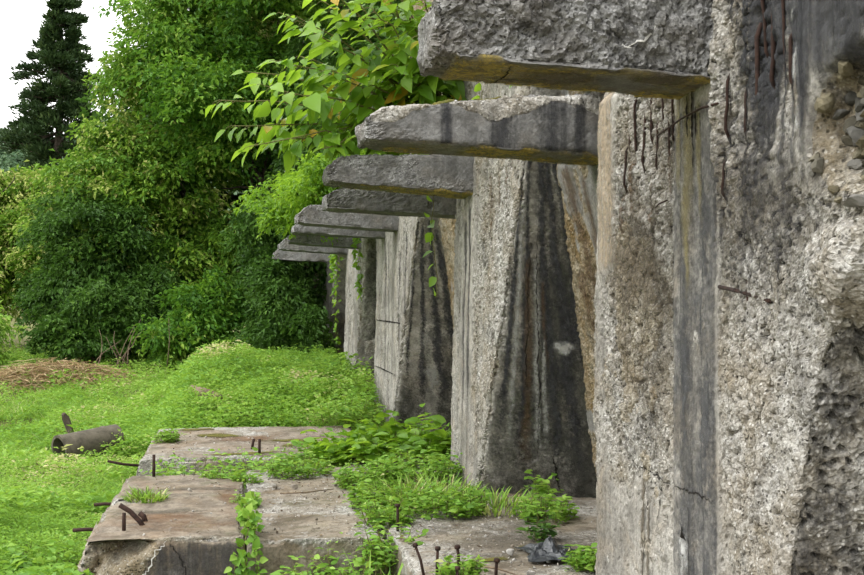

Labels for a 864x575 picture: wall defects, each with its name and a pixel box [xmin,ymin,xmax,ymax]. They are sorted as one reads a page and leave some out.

water stain [441,103,452,144]
spalling [807,59,864,213]
water stain [353,184,473,199]
water stain [365,209,471,451]
water stain [443,0,864,575]
crack [142,540,186,575]
crack [639,466,712,573]